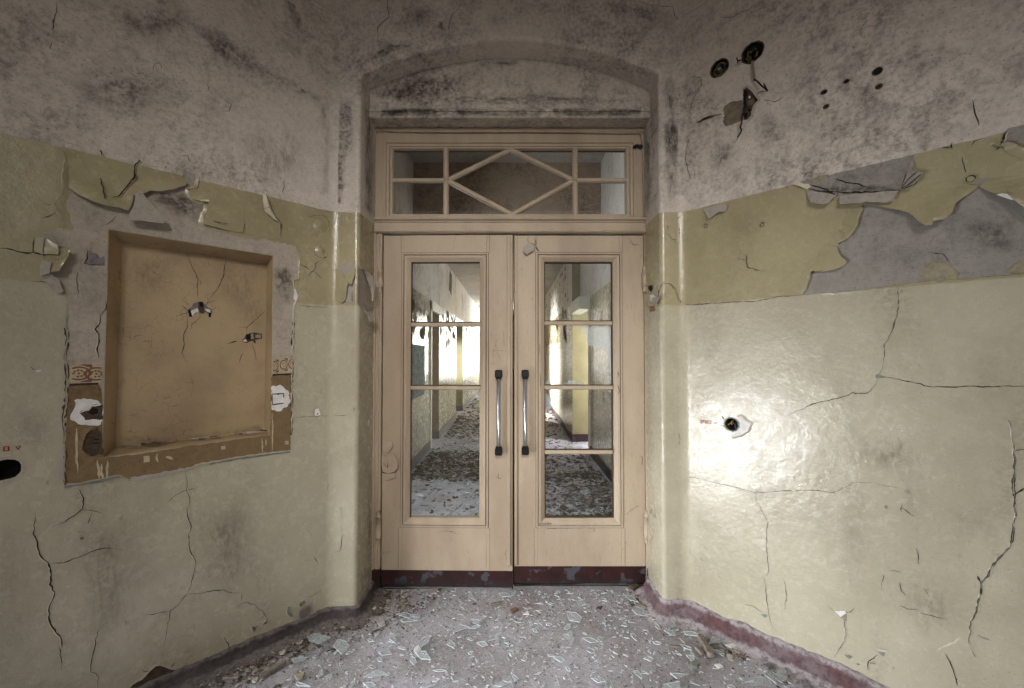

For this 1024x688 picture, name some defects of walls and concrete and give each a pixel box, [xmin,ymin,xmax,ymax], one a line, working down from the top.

peeling [34,142,300,488]
crack [177,253,226,361]
peeling [335,260,375,322]
crack [791,287,1001,414]
peeling [792,154,1024,296]
crack [32,489,113,669]
crack [89,624,101,686]
crack [143,473,267,672]
crack [690,477,915,628]
crack [827,605,852,658]
crack [882,549,942,619]
crack [936,420,1024,684]